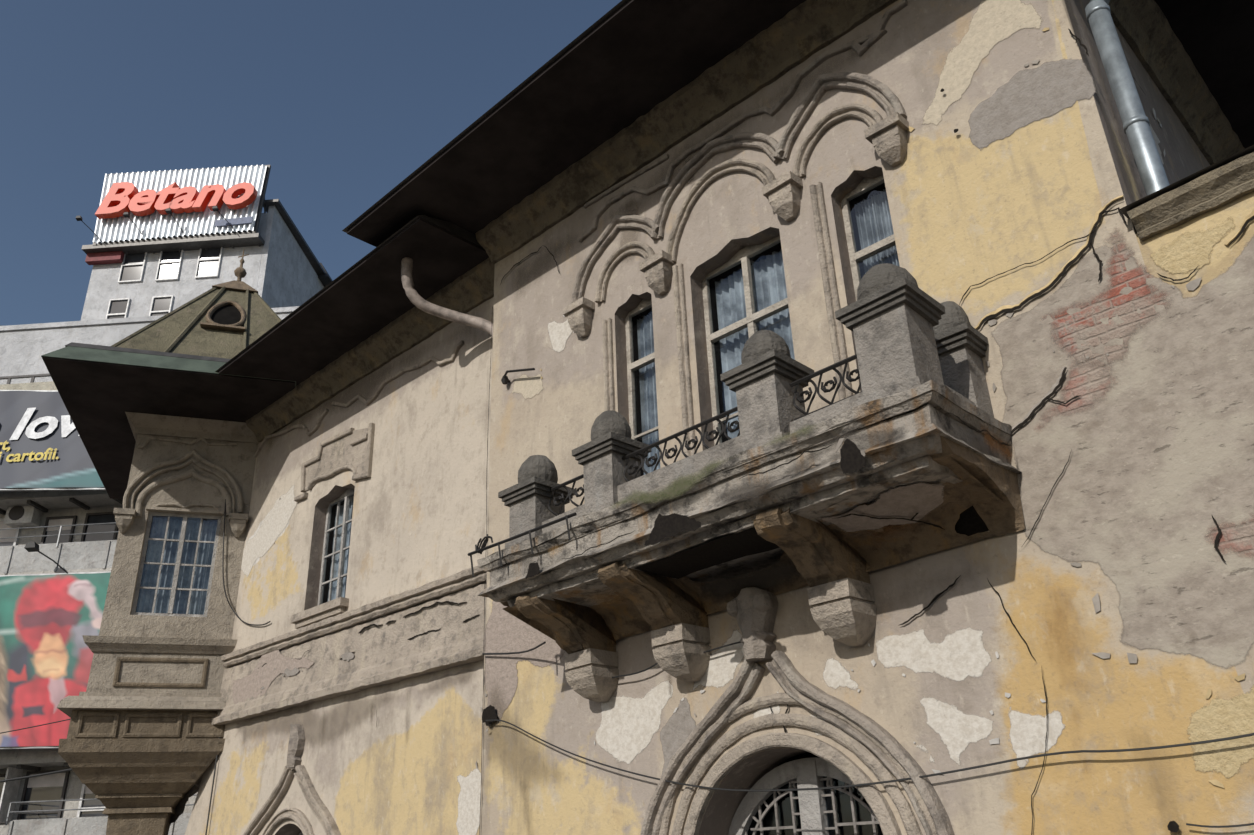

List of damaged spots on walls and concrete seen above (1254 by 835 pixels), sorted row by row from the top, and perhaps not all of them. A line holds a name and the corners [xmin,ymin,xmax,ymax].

peeling [907,0,1049,132]
peeling [968,59,1096,151]
crack [959,195,1127,330]
crack [1157,266,1198,281]
crack [1224,214,1254,246]
crack [951,367,1081,446]
crack [741,444,834,478]
flaking render [986,232,1254,788]
peeling [868,627,999,681]
peeling [594,630,744,777]
crack [898,575,1047,835]
peeling [920,692,1065,769]